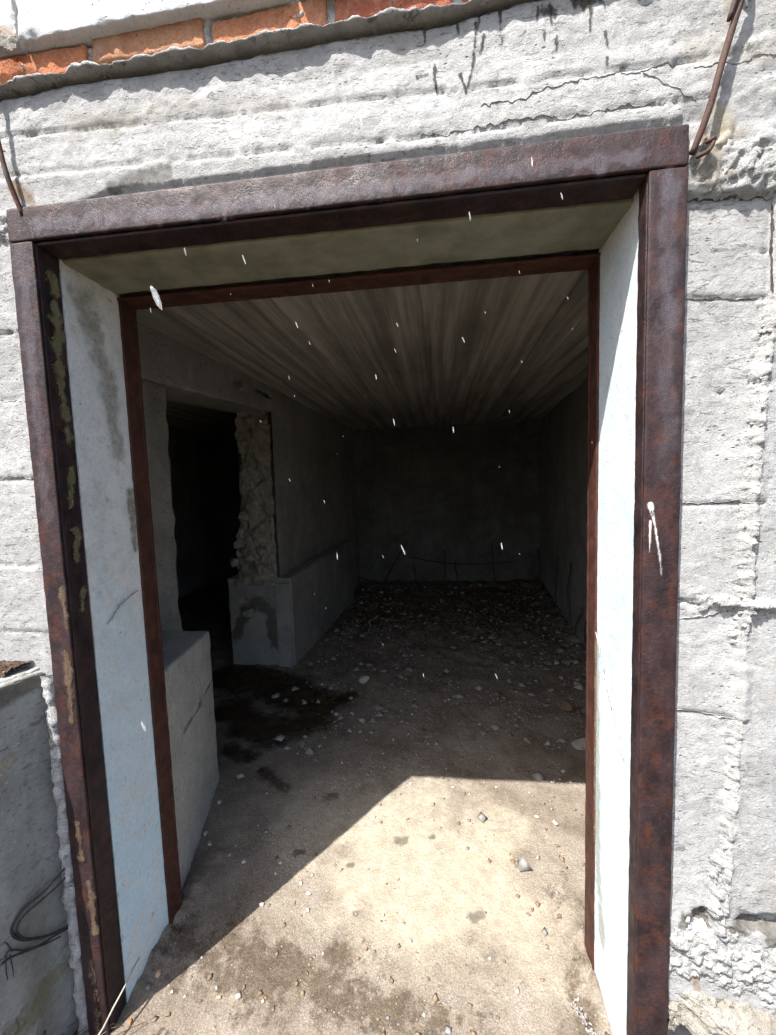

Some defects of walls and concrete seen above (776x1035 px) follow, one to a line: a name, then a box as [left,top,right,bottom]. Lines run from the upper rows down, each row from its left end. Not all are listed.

water stain [379,3,522,93]
water stain [536,2,558,51]
water stain [571,0,606,31]
crack [422,53,776,137]
rust [702,108,734,173]
water stain [212,664,358,788]
spalling [669,906,776,1014]